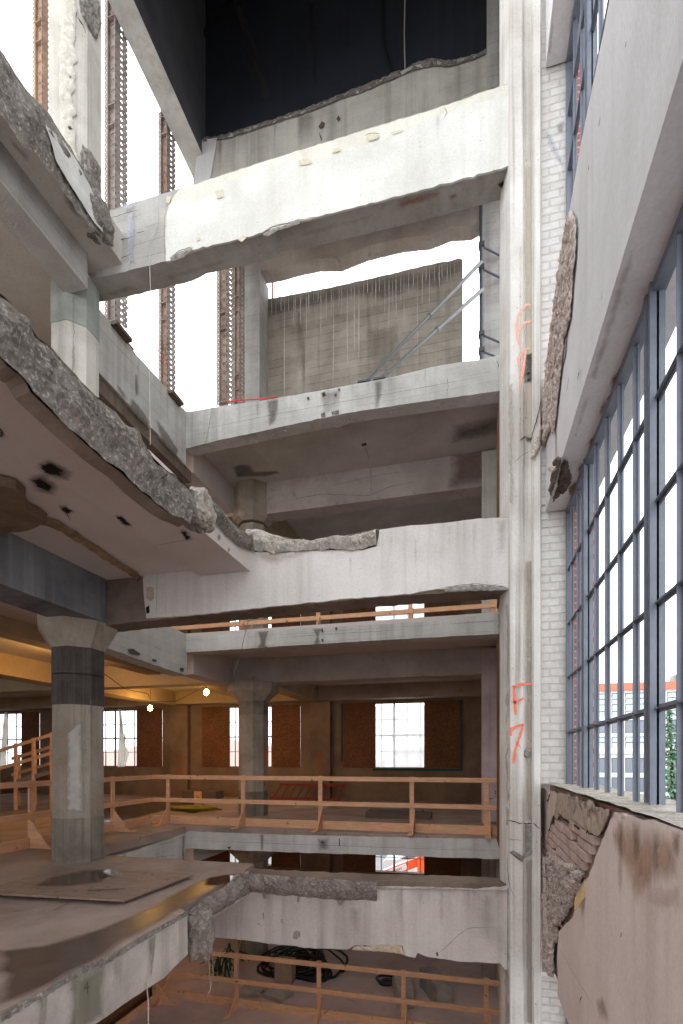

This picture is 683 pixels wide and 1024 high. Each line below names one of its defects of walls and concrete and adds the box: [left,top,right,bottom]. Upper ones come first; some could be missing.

spalling [0,0,115,247]
spalling [0,293,377,553]
damp [269,266,455,422]
spalling [521,210,577,503]
spalling [0,873,378,1023]
crack [506,794,598,840]
spalling [507,788,600,978]